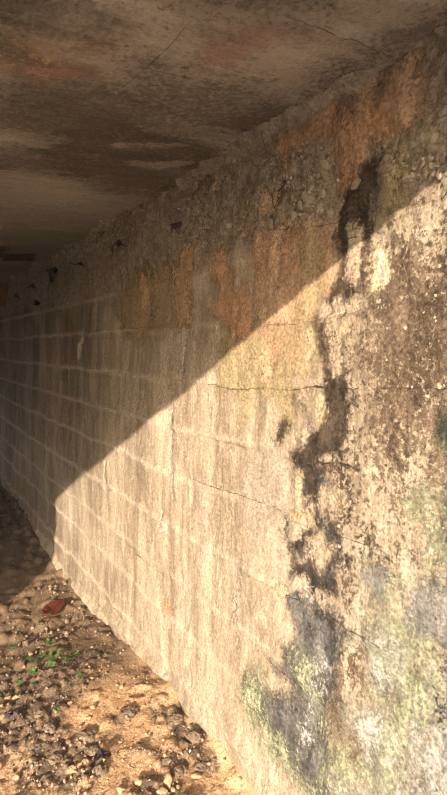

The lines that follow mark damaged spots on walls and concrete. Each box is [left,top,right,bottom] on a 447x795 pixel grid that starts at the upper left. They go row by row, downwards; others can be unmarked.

leakage [0,0,447,197]
spalling [376,84,447,185]
crack [212,384,447,399]
leakage [219,147,447,772]